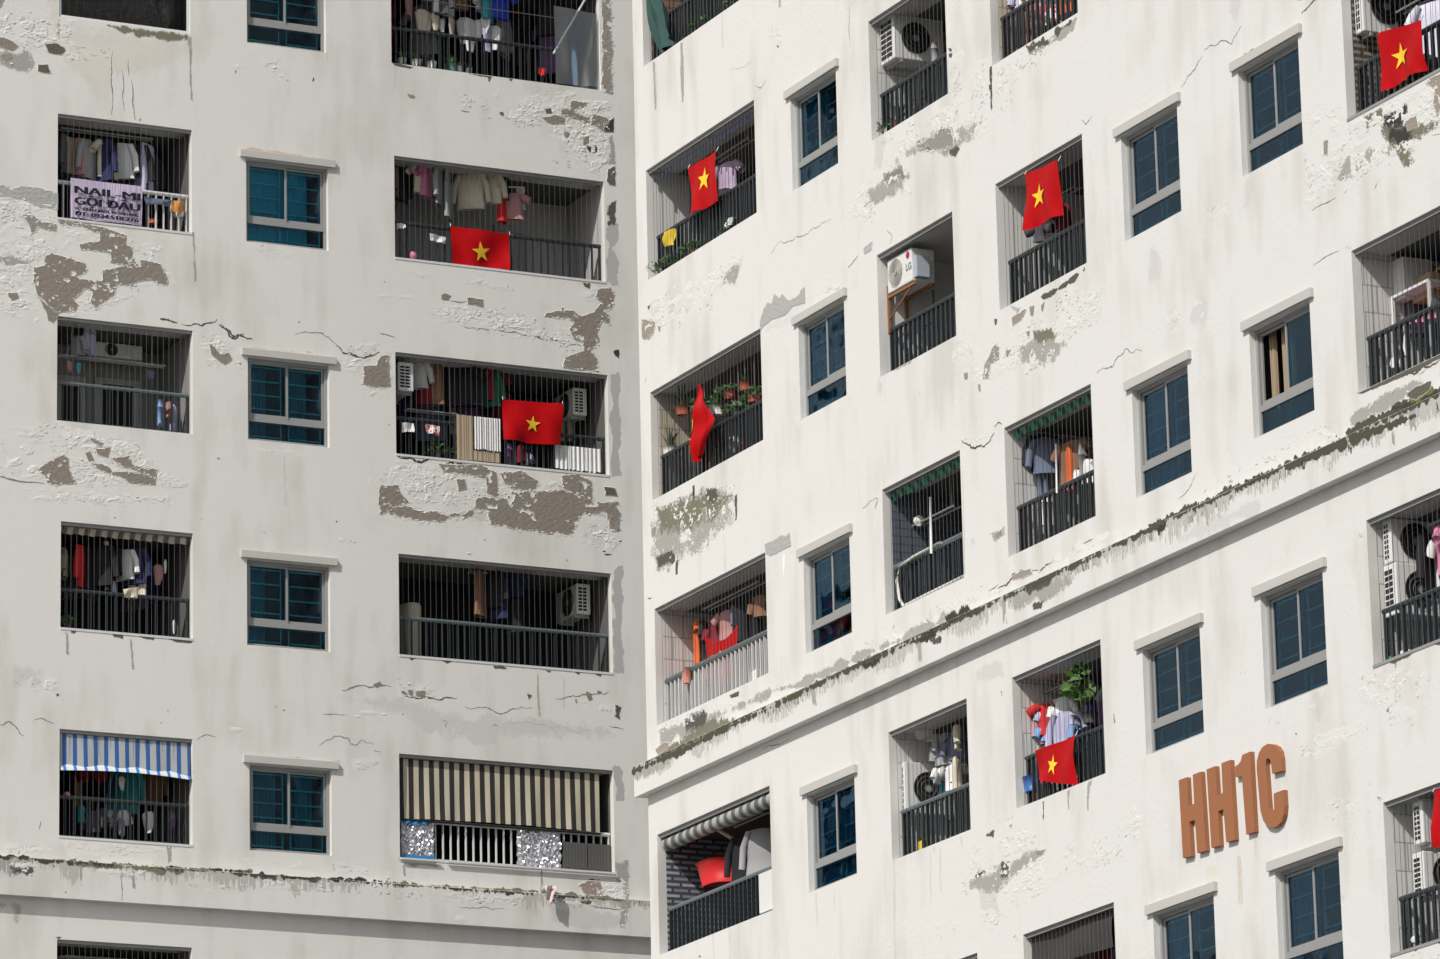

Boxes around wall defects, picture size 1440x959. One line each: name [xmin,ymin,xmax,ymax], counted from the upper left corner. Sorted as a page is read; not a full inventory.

peeling [458,0,616,186]
peeling [1304,75,1440,192]
spalling [0,185,177,327]
crack [160,318,252,340]
crack [295,332,395,359]
peeling [429,283,614,371]
damp [1020,328,1067,369]
peeling [0,422,188,519]
spalling [371,459,621,555]
damp [609,372,622,477]
crack [320,685,622,752]
damp [0,846,444,898]